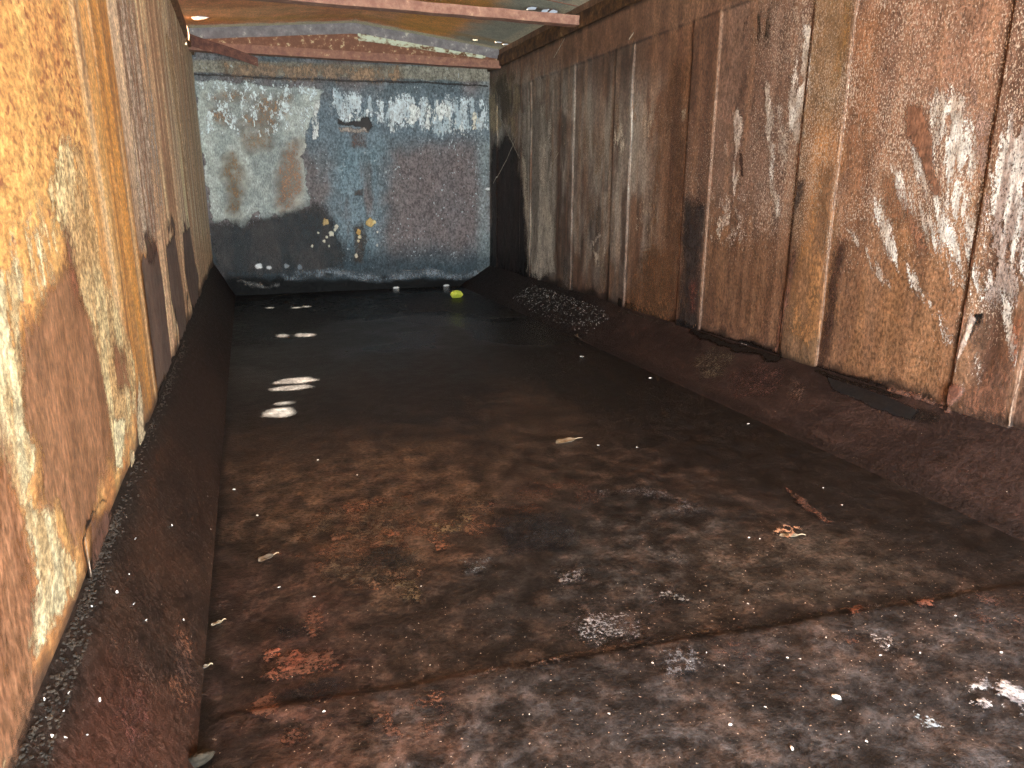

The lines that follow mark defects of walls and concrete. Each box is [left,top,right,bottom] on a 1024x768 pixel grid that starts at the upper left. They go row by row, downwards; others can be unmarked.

rust [22,231,129,556]
peeling [195,78,323,227]
spalling [338,116,373,147]
leakage [489,70,652,291]
leakage [764,10,814,217]
leakage [819,196,953,367]
leakage [890,133,986,306]
leakage [1000,286,1018,371]
rust [291,479,606,602]
rust [250,604,341,717]
leakage [569,611,642,648]
leakage [966,677,1024,714]